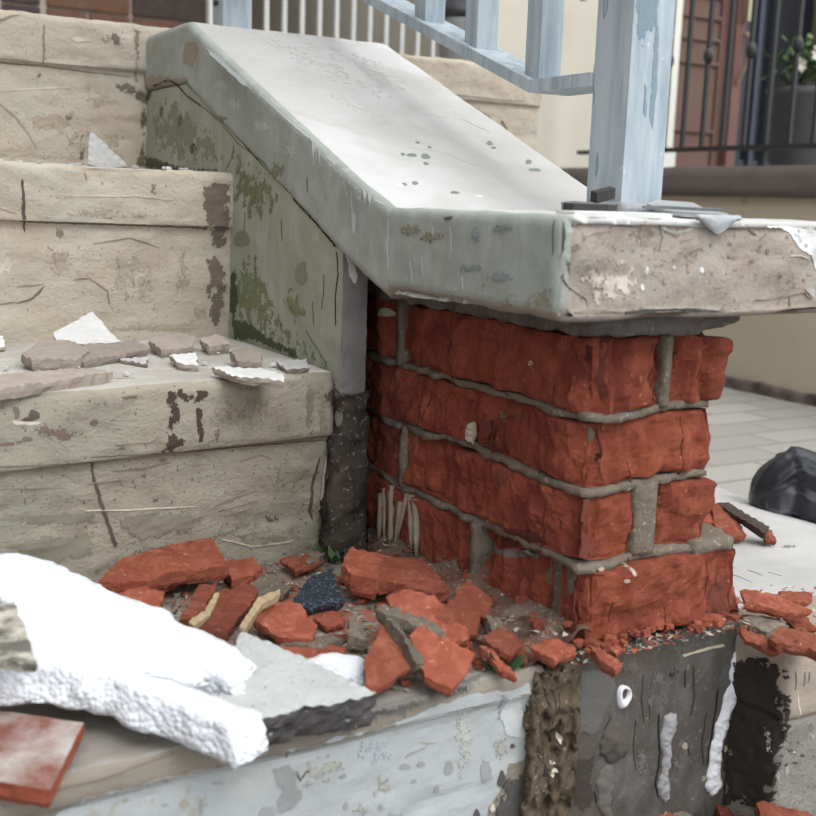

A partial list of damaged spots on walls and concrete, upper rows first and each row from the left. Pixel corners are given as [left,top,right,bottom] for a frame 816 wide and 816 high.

crack [0,25,129,149]
peeling [635,0,659,129]
crack [0,179,207,248]
leakage [196,182,232,249]
crack [292,177,339,326]
peeling [766,225,816,269]
crack [0,284,44,305]
leakage [209,285,226,326]
peeling [0,330,263,425]
crack [0,439,327,548]
spalling [495,528,545,549]
spalling [578,498,594,560]